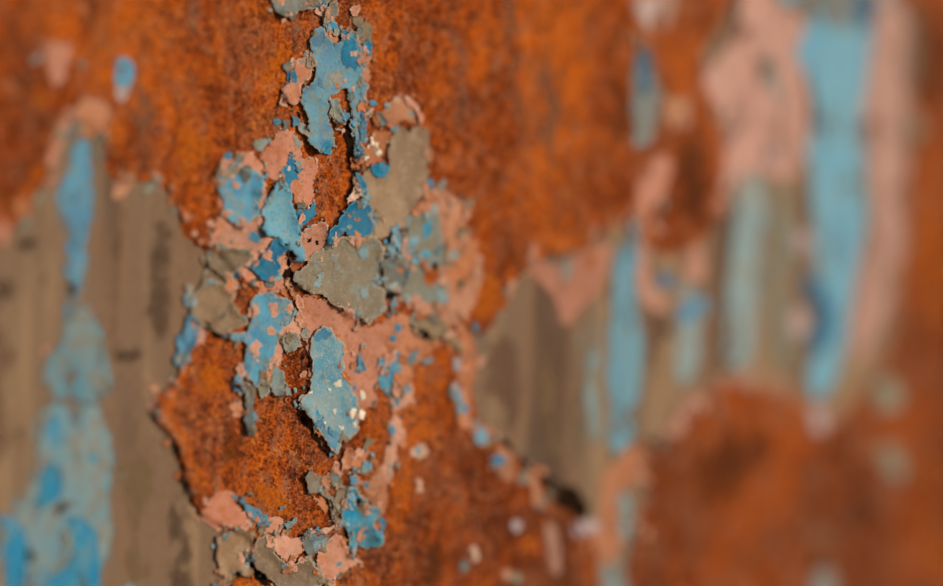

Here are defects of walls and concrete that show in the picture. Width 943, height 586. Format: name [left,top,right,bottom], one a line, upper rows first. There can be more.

corrosion [0,0,729,586]
peeling [173,0,561,586]